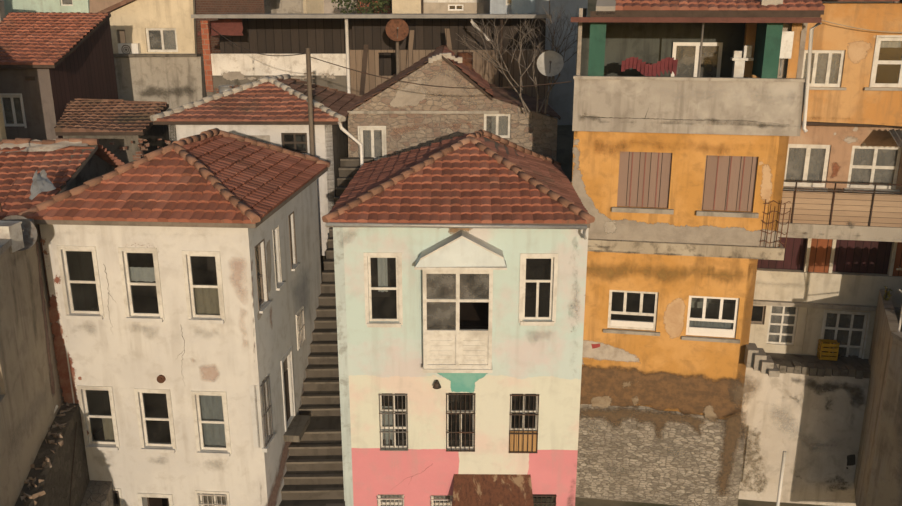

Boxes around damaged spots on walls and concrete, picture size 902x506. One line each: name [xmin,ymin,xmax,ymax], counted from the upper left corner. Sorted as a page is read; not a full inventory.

flaking render [20,294,89,505]
spalling [582,340,639,365]